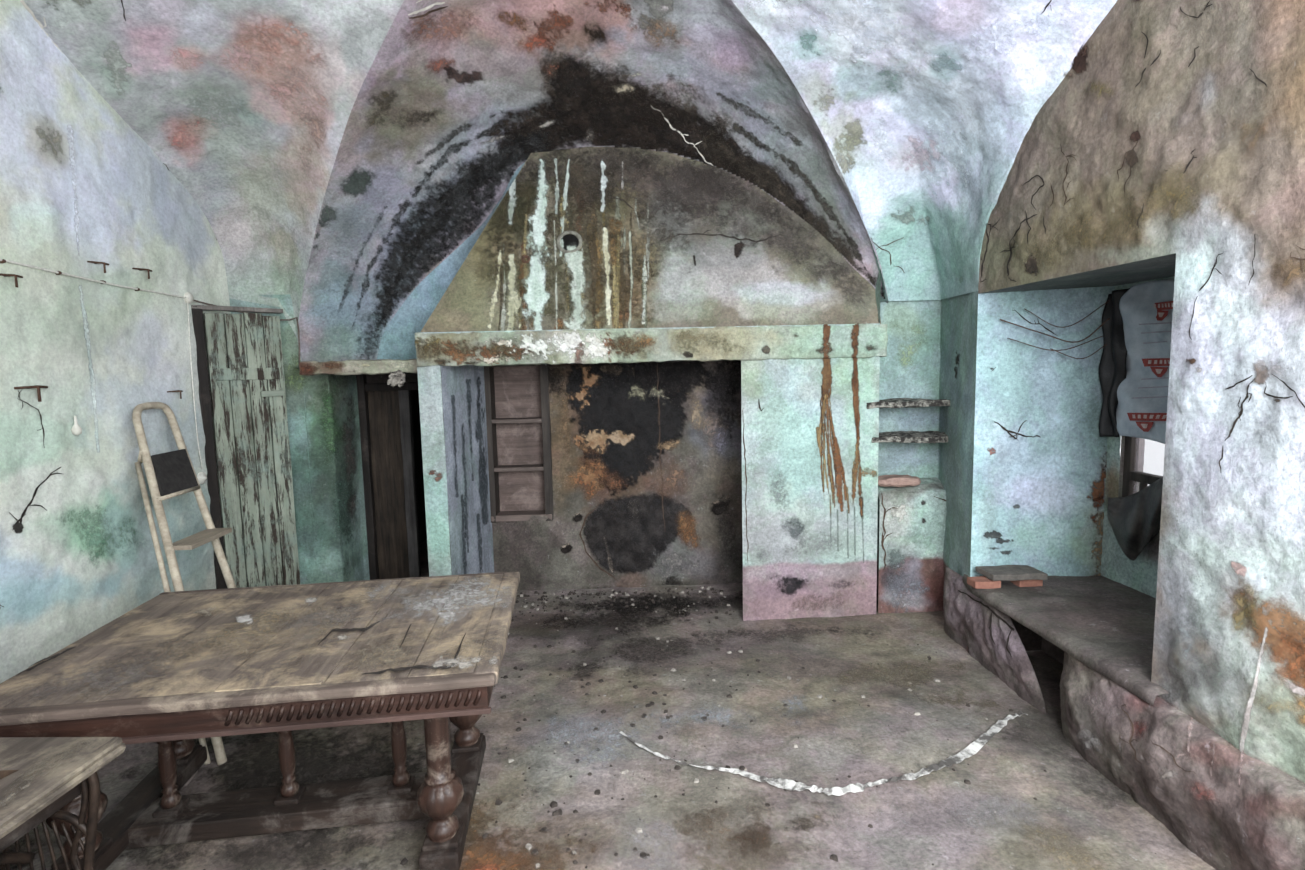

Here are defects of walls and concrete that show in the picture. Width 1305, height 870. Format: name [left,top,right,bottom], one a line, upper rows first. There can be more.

flaking render [366,91,437,127]
flaking render [444,67,483,84]
crack [651,105,713,166]
water stain [313,205,336,249]
water stain [340,114,665,359]
water stain [701,93,885,299]
crack [1189,234,1256,340]
corrosion [415,336,533,367]
crack [9,390,62,534]
corrosion [816,323,877,517]
crack [1219,374,1305,472]
corrosion [1231,561,1305,725]